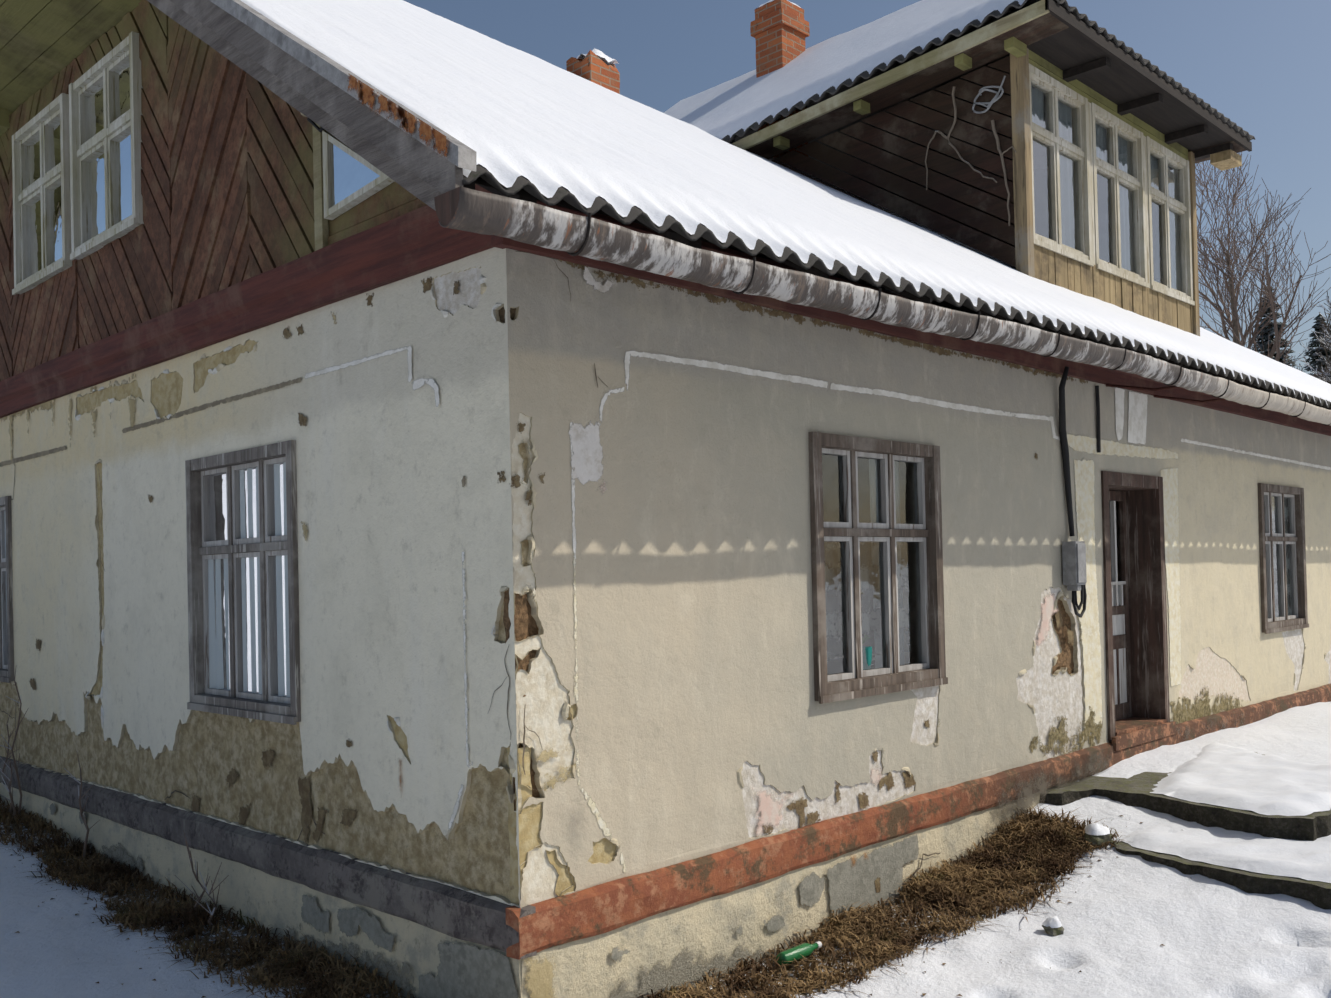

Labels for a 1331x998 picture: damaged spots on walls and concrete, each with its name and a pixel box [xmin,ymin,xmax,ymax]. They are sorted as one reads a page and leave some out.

flaking render [422,267,516,323]
flaking render [75,340,258,421]
flaking render [0,413,576,905]
flaking render [1016,587,1084,759]
flaking render [1178,647,1250,702]
flaking render [910,685,941,747]
flaking render [737,748,916,838]
spalling [588,838,621,864]